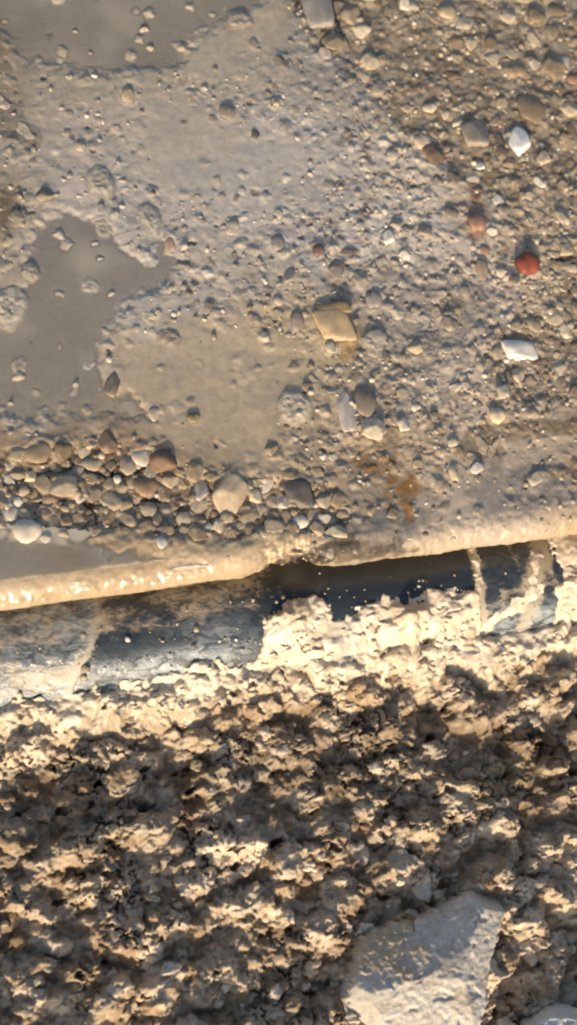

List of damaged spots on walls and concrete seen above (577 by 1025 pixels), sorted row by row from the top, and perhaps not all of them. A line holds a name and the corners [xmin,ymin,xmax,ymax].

corrosion [352,456,418,523]
spalling [253,553,333,574]